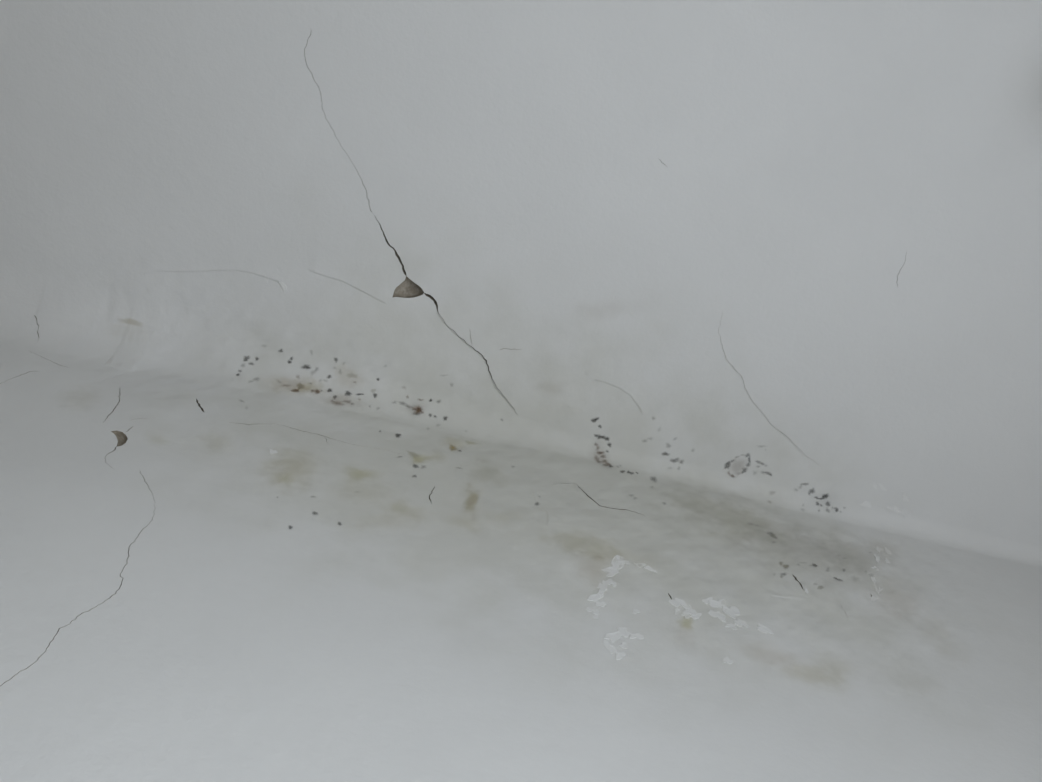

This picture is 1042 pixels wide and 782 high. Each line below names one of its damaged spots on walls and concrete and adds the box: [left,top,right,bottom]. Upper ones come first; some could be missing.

crack [304,34,519,414]
flaking render [392,276,424,298]
crack [105,389,145,468]
crack [563,483,645,516]
crack [0,470,156,686]
peeling [669,597,773,634]